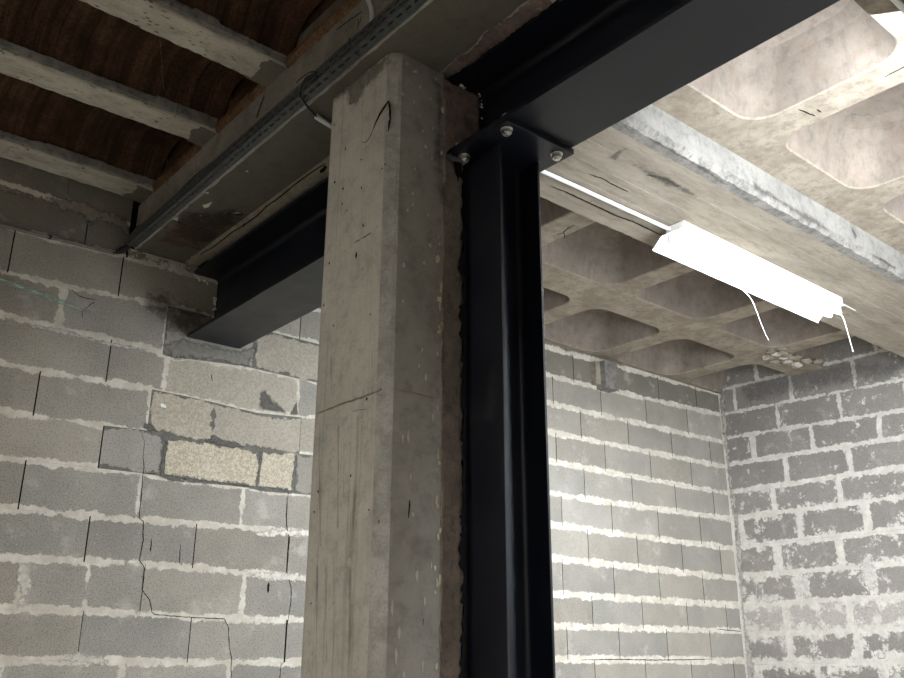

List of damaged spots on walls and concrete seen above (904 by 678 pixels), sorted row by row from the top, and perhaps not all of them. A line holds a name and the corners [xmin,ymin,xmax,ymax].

crack [139,430,232,678]